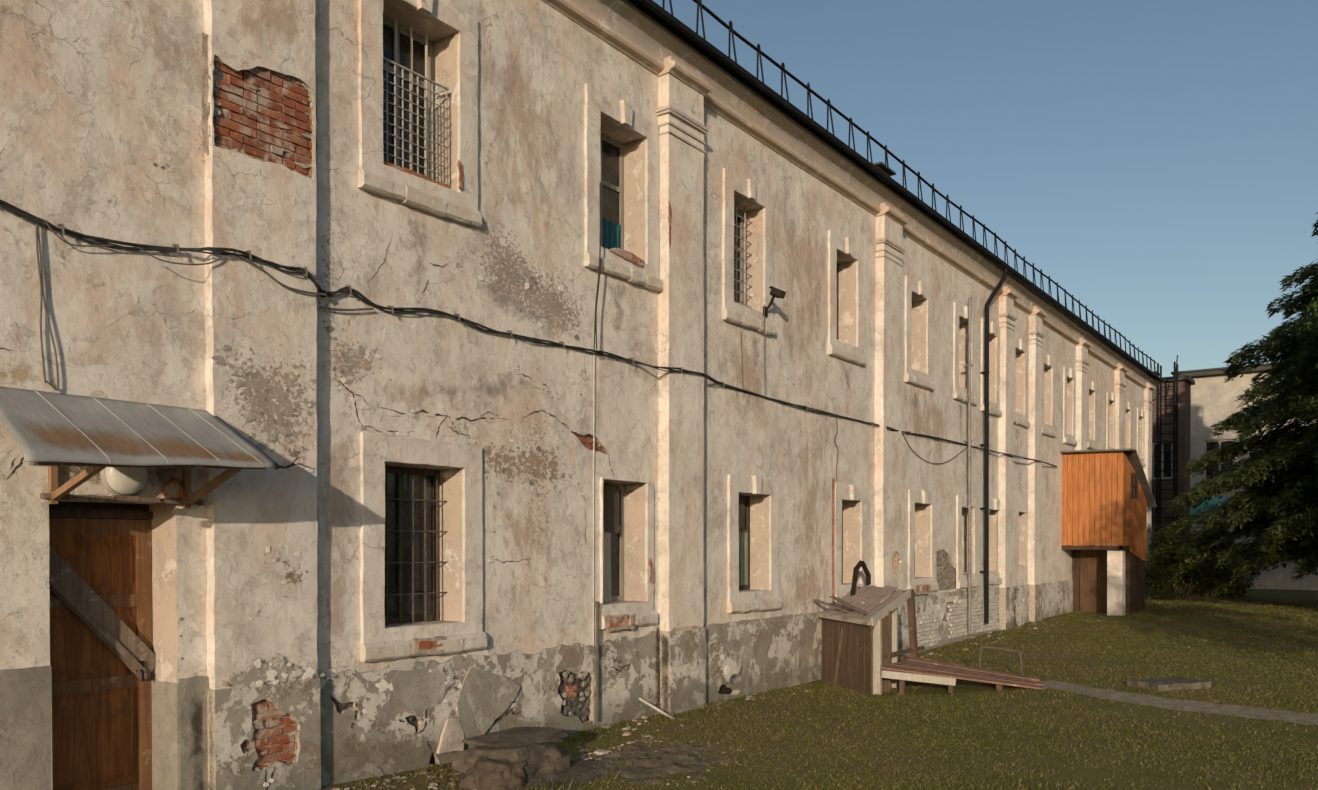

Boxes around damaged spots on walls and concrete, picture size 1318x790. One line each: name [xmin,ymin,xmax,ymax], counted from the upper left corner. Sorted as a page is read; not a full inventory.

spalling [201,33,318,190]
peeling [212,221,392,460]
peeling [472,221,589,344]
corrosion [38,428,255,461]
crack [333,374,571,436]
peeling [479,396,609,560]
flaking render [915,549,1026,647]
spalling [221,652,325,772]
spalling [557,651,628,724]